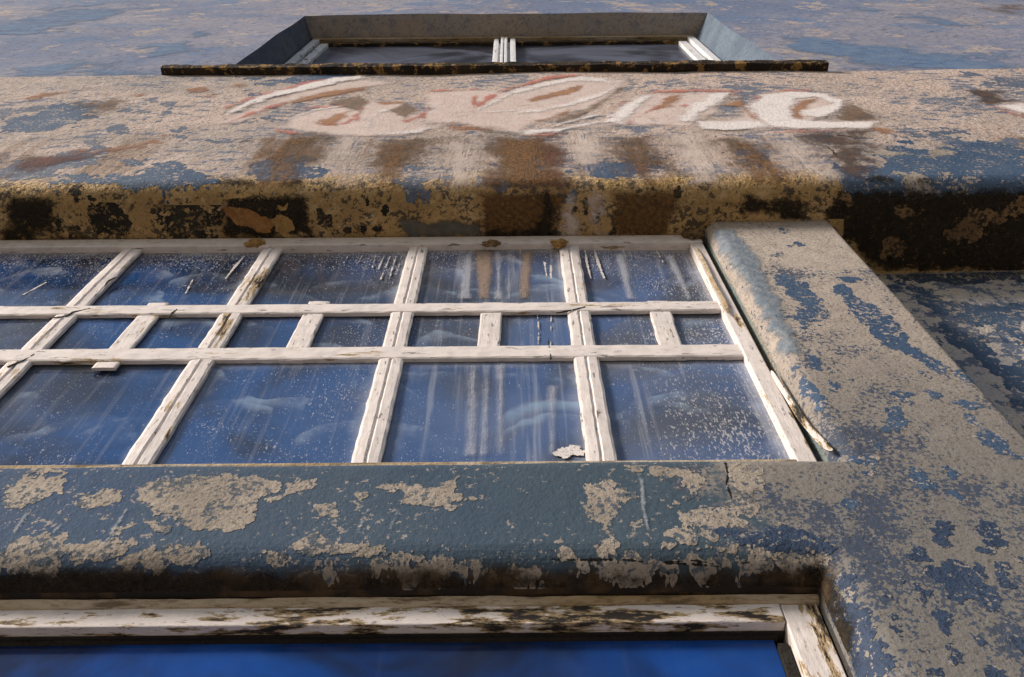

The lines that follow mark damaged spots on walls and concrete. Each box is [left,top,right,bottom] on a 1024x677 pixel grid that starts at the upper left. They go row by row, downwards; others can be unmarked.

mould [0,185,133,240]
water stain [149,178,389,239]
water stain [399,130,561,237]
mould [733,194,805,220]
water stain [796,105,1024,272]
peeling [713,228,1024,477]
peeling [0,468,318,586]
peeling [260,532,495,590]
peeling [354,475,478,512]
crack [724,462,732,499]
peeling [555,462,903,677]
peeling [899,520,1024,677]